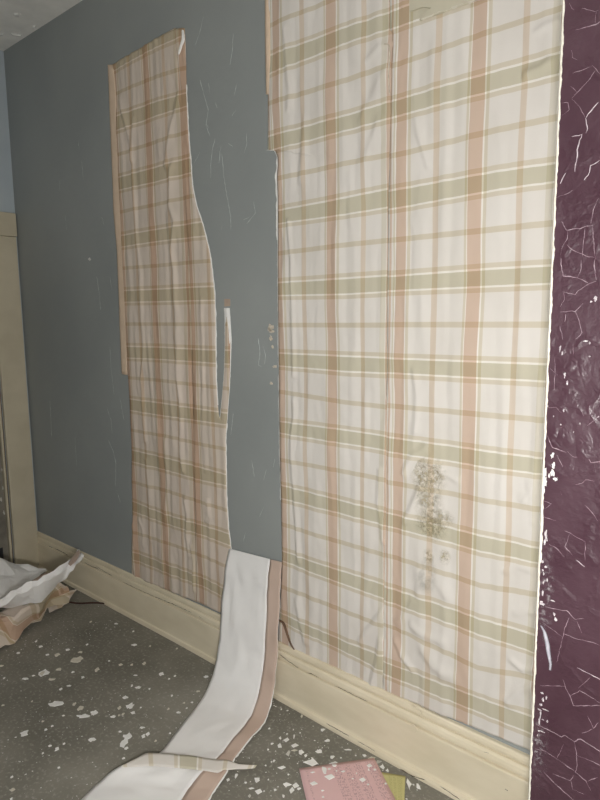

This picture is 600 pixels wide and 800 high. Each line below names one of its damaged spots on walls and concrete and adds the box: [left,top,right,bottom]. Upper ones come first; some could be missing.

crack [560,50,600,196]
crack [560,202,597,354]
crack [548,607,598,661]
crack [536,668,600,800]